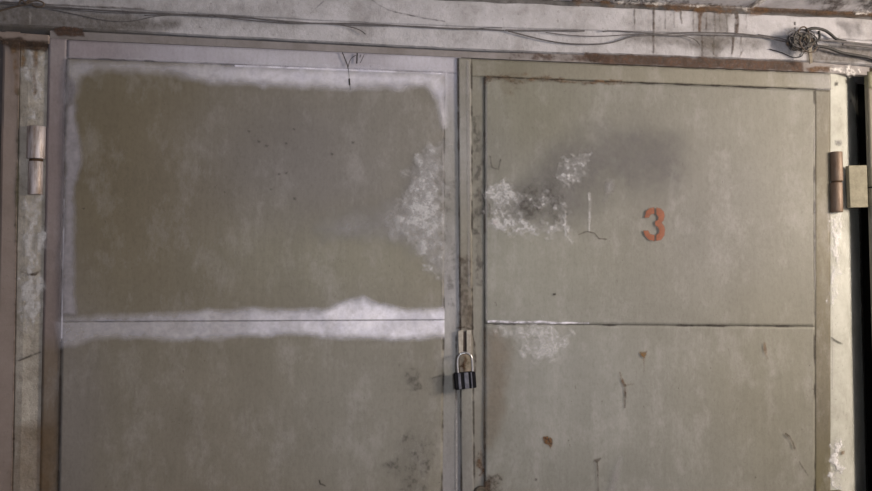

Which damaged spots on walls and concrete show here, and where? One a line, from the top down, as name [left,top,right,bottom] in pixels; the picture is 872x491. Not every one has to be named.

leakage [669,1,742,53]
rust [575,53,861,75]